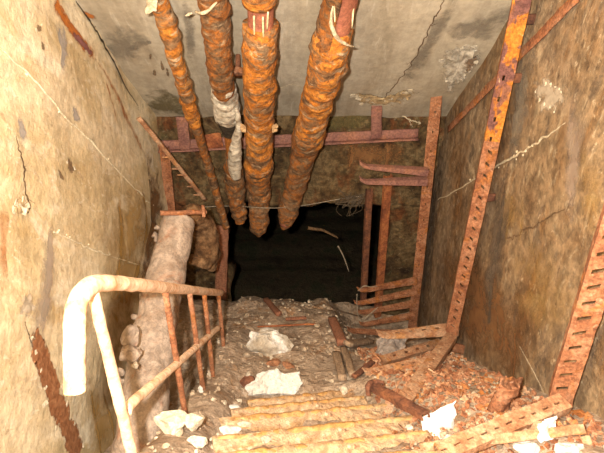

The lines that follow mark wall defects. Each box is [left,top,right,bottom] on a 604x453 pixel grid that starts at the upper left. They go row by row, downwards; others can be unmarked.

corrosion [55,0,93,57]
crack [76,2,137,104]
crack [386,0,444,96]
spalling [439,44,479,92]
crack [16,138,34,213]
crack [505,209,565,241]